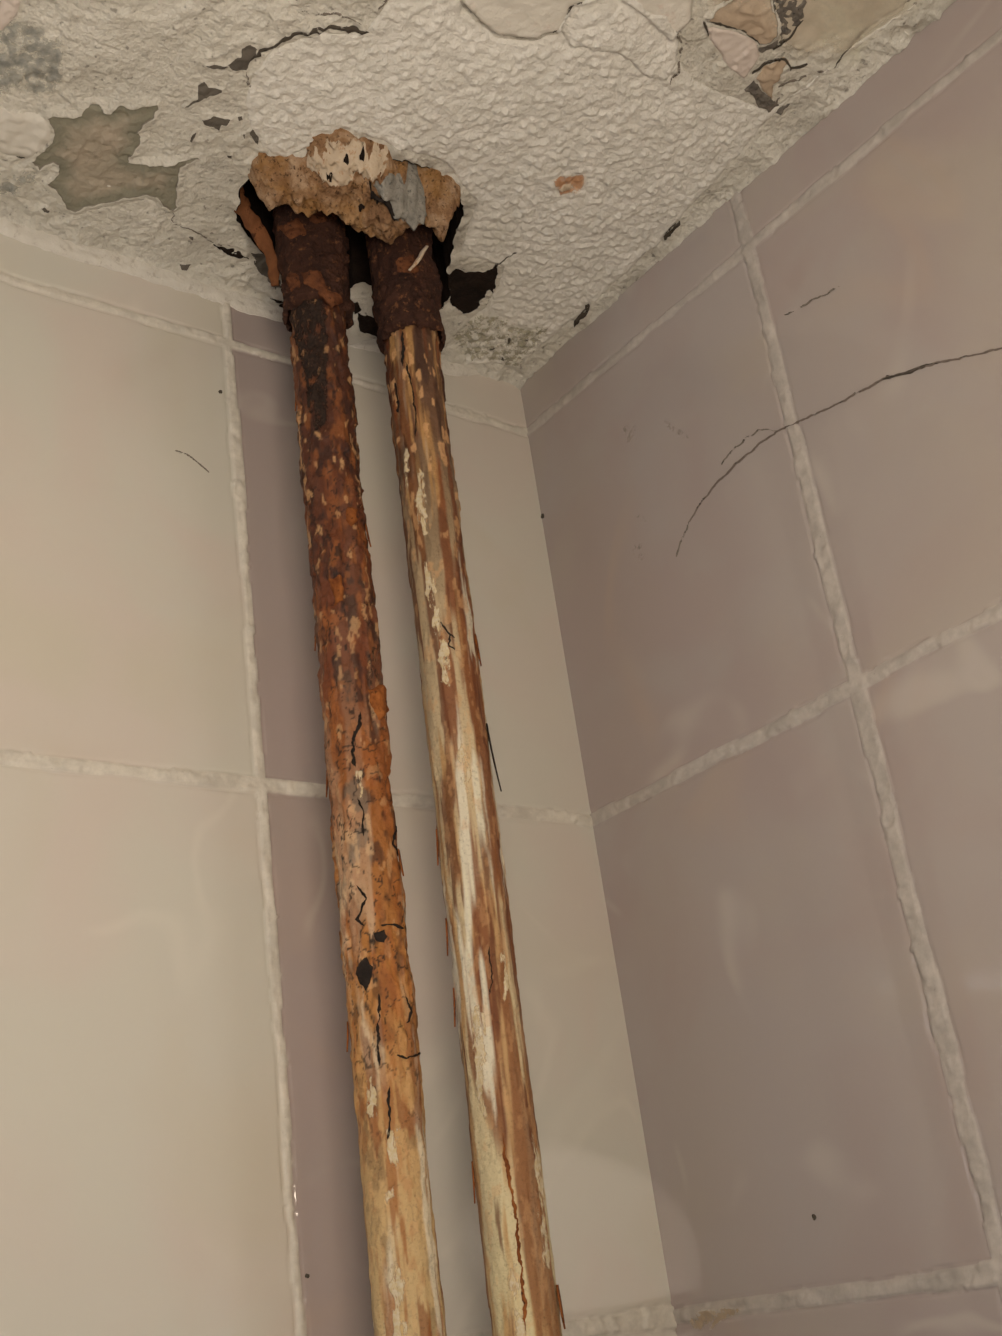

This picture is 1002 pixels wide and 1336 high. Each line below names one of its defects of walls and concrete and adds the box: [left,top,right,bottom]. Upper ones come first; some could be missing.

peeling [553,0,682,85]
damp [768,0,902,49]
peeling [17,42,283,308]
spalling [326,145,365,182]
corrosion [277,210,350,266]
corrosion [286,270,343,309]
spalling [344,204,378,337]
spalling [431,199,516,314]
crack [784,288,835,315]
crack [676,347,1002,557]
corrosion [368,684,389,720]
corrosion [486,723,502,791]